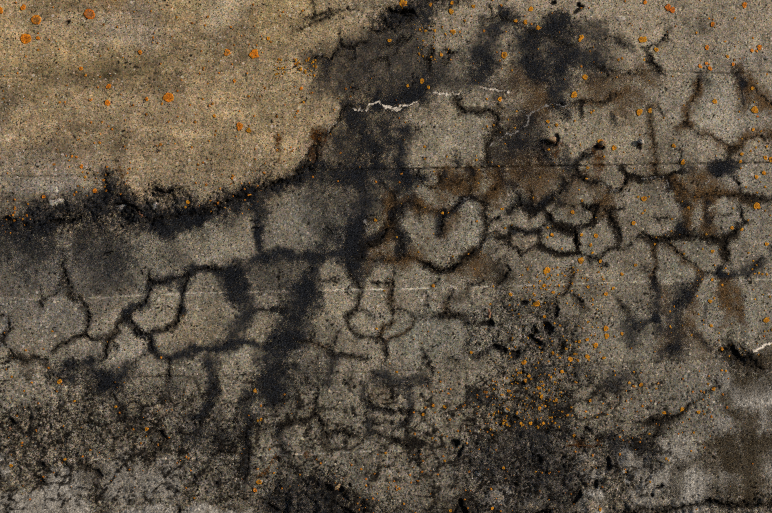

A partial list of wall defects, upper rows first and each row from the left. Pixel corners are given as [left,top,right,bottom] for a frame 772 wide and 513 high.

crack [141,104,353,222]
water stain [0,0,609,419]
crack [298,93,771,365]
water stain [675,159,743,235]
crack [675,78,772,163]
water stain [734,69,751,111]
water stain [625,276,706,359]
water stain [714,248,772,319]
crack [0,259,772,513]
water stain [373,371,425,428]
water stain [613,342,772,513]